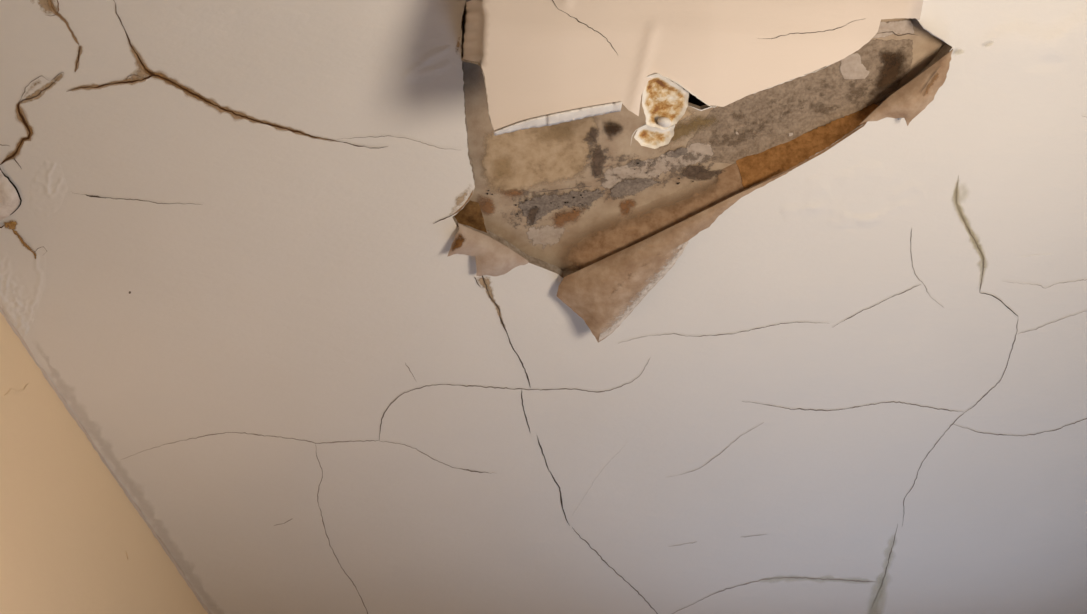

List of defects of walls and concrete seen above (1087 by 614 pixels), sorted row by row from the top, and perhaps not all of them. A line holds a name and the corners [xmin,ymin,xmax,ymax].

crack [72,192,201,205]
crack [0,0,456,169]
peeling [447,223,528,276]
flaking render [481,116,597,193]
flaking render [526,224,569,249]
damp [478,111,764,228]
flaking render [600,20,953,189]
crack [129,176,1087,614]